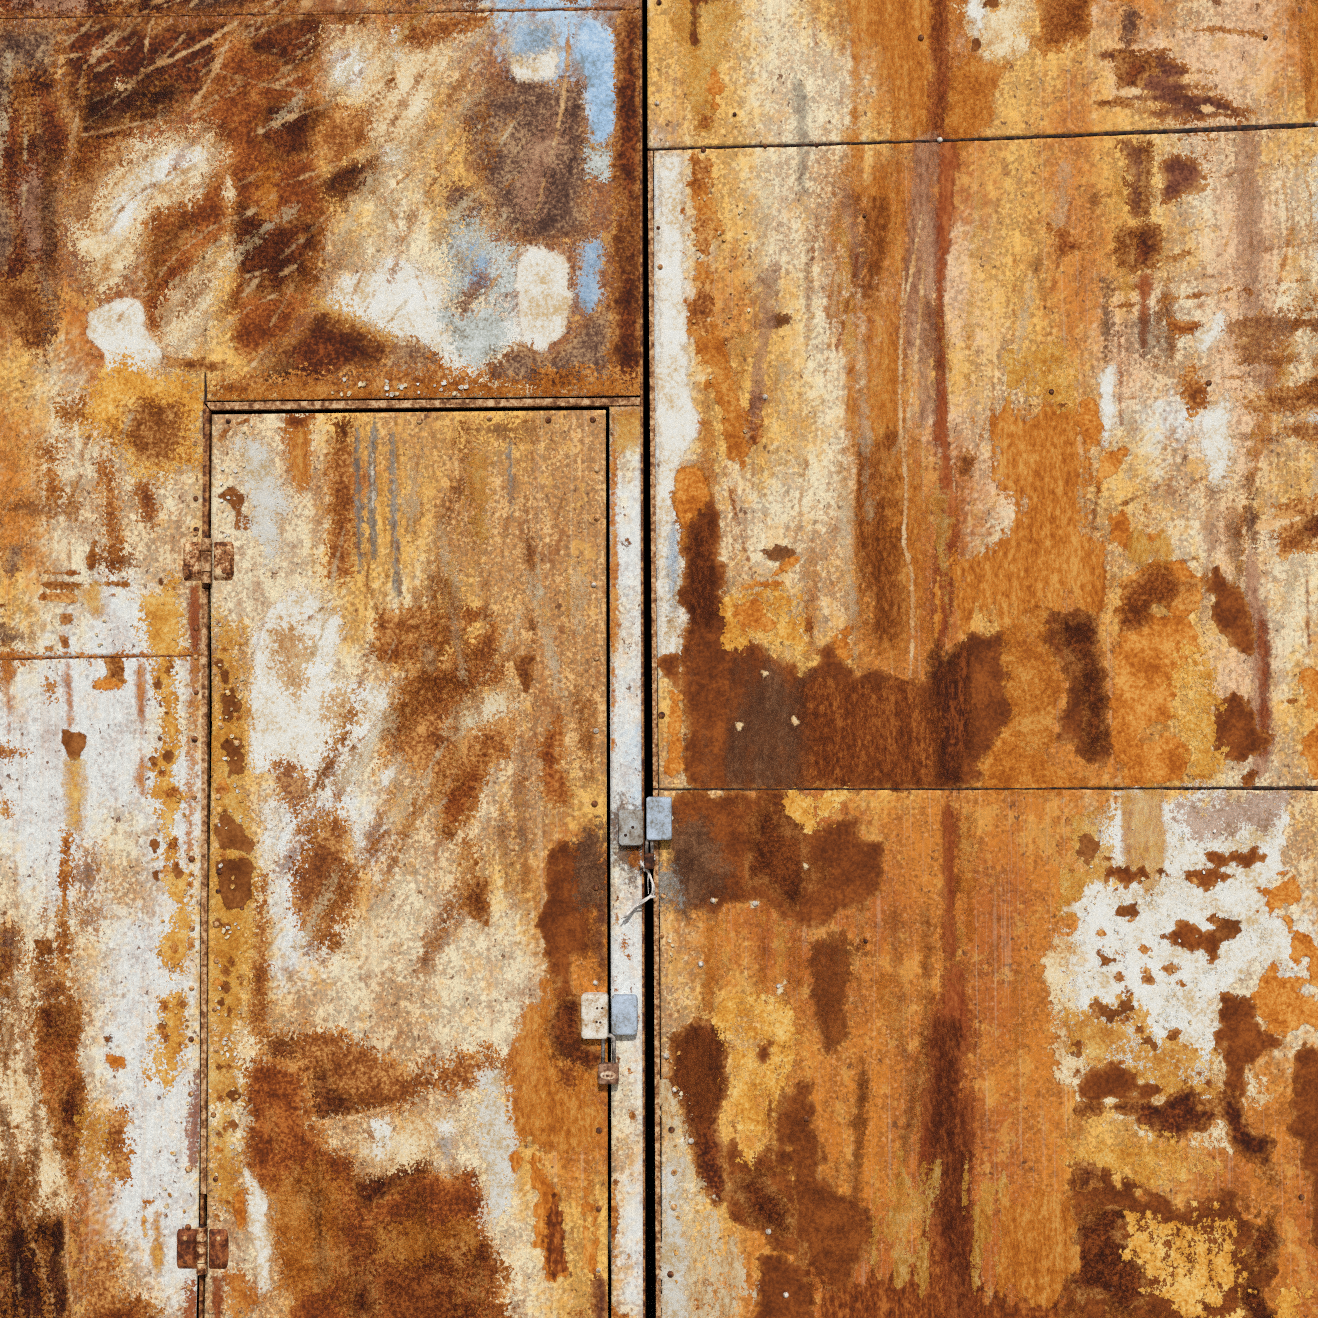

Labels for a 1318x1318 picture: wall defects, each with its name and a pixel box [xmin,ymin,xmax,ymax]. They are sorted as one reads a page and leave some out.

corrosion [0,0,641,712]
corrosion [0,584,642,1318]
corrosion [657,0,1318,1318]
peeling [1033,772,1302,1157]